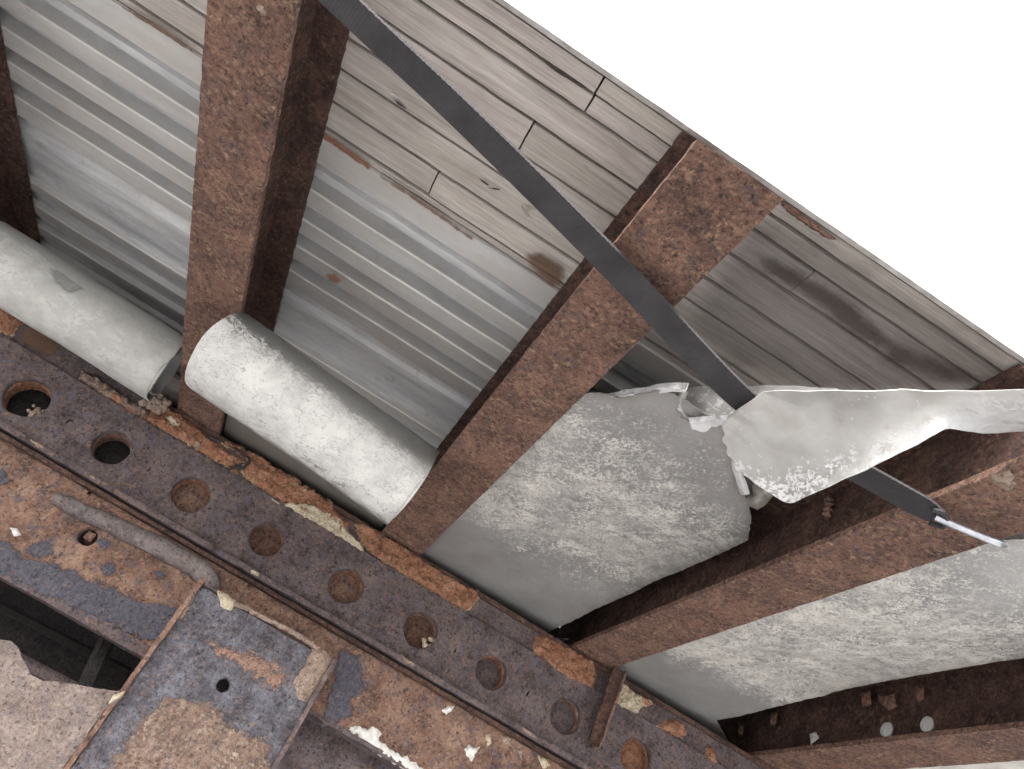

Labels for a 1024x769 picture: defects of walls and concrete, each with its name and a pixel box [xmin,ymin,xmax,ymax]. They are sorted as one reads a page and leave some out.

rust [780,201,836,240]
damp [528,254,561,285]
rust [0,308,56,354]
damp [767,262,962,380]
rust [78,370,480,612]
peeling [268,497,364,551]
peeling [0,528,178,640]
rust [109,694,271,769]
rust [206,590,331,703]
peeling [321,650,423,769]
rust [532,636,597,689]
rust [617,684,653,714]